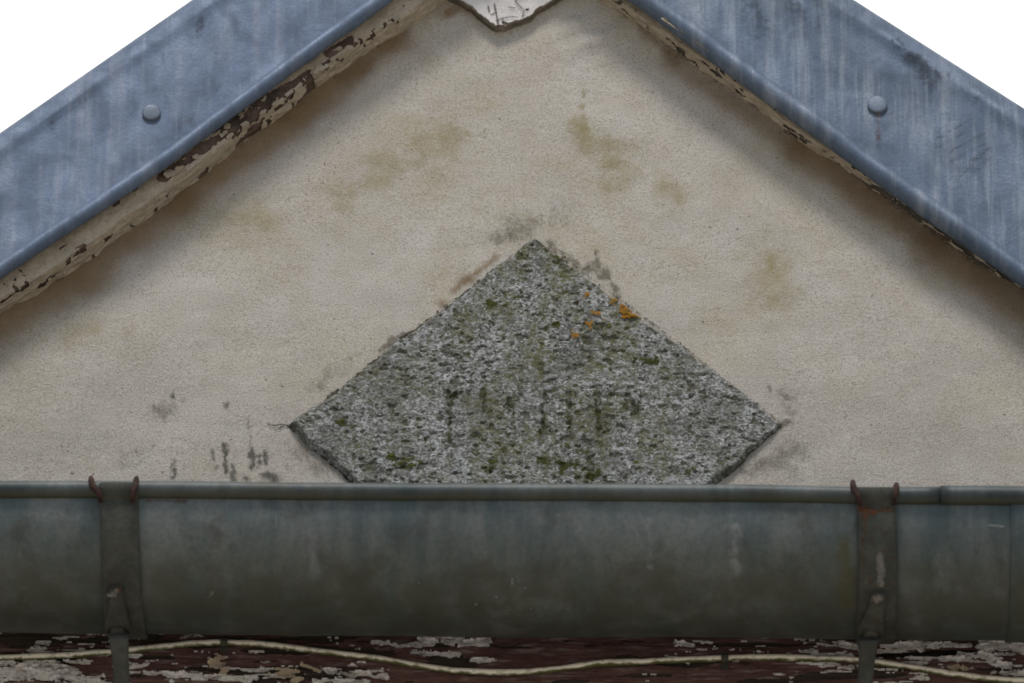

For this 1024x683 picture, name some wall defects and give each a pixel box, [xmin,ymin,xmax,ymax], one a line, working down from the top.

peeling [163,154,199,179]
leakage [0,32,405,335]
leakage [212,443,278,482]
peeling [0,659,108,683]
peeling [129,655,389,683]
peeling [371,637,497,663]
peeling [673,638,712,647]
peeling [799,640,859,670]
peeling [880,640,1024,677]